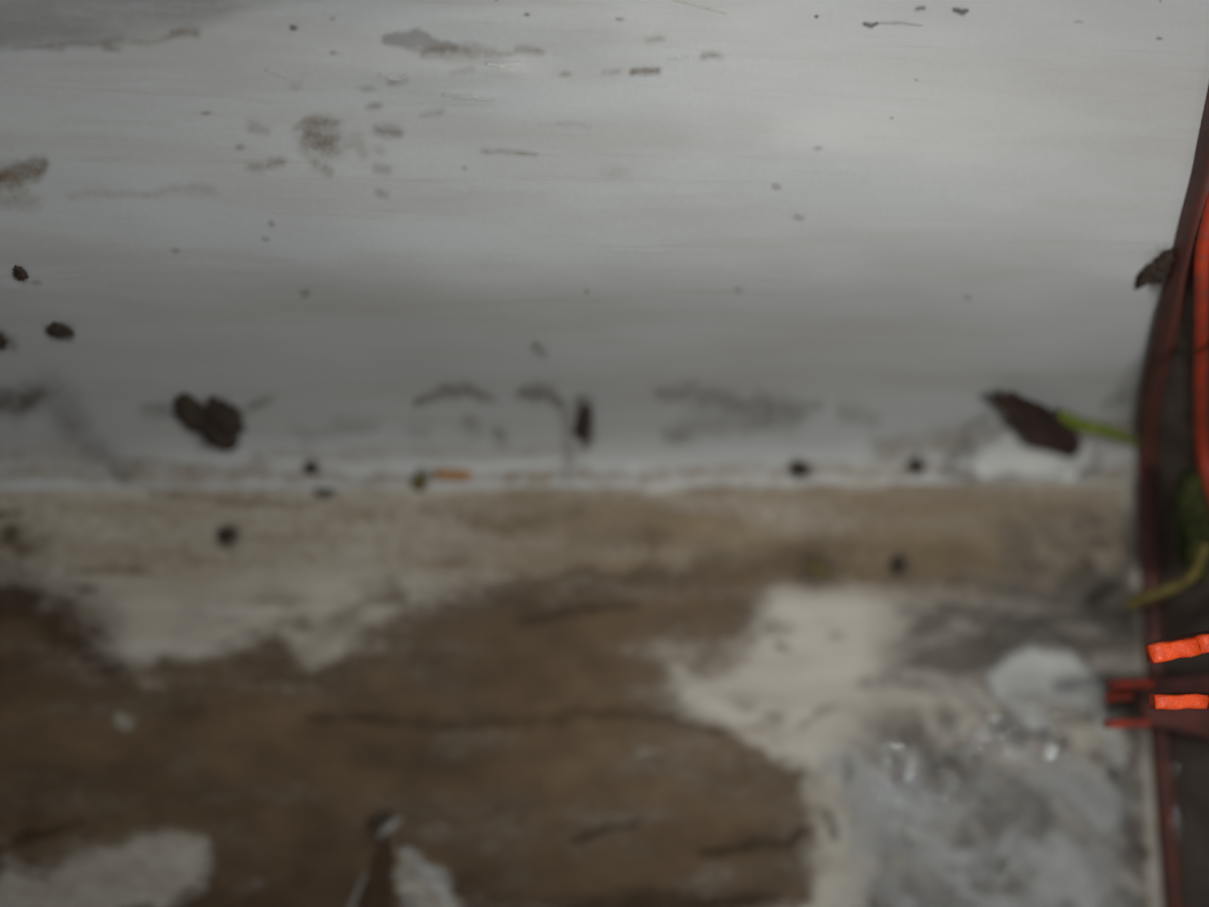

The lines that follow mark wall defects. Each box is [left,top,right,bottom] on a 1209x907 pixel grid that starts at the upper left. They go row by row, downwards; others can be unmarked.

leakage [987,648,1125,766]
leakage [846,757,1122,907]